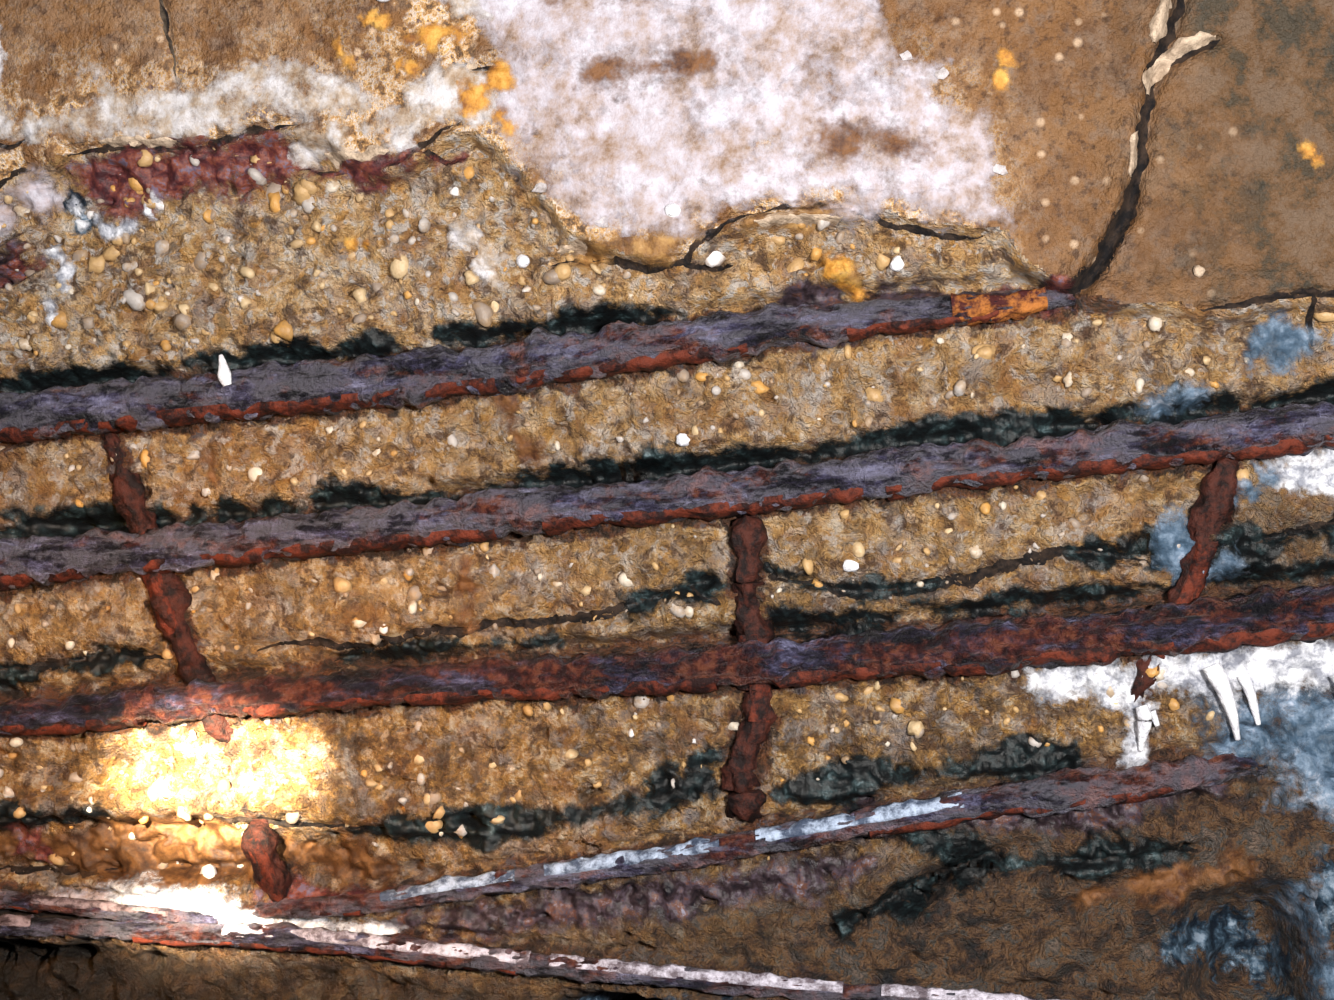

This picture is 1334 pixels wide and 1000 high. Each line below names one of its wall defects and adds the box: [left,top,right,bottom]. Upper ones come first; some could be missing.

corrosion [62,130,469,235]
spalling [0,0,1053,393]
crack [1060,0,1220,297]
corrosion [777,253,1073,357]
spalling [0,292,1334,531]
spalling [175,516,738,683]
corrosion [748,623,1334,723]
leakage [1026,639,1334,818]
corrosion [0,811,401,917]
spalling [0,654,1334,1000]
leakage [881,984,1069,1000]
leakage [1157,847,1334,1000]